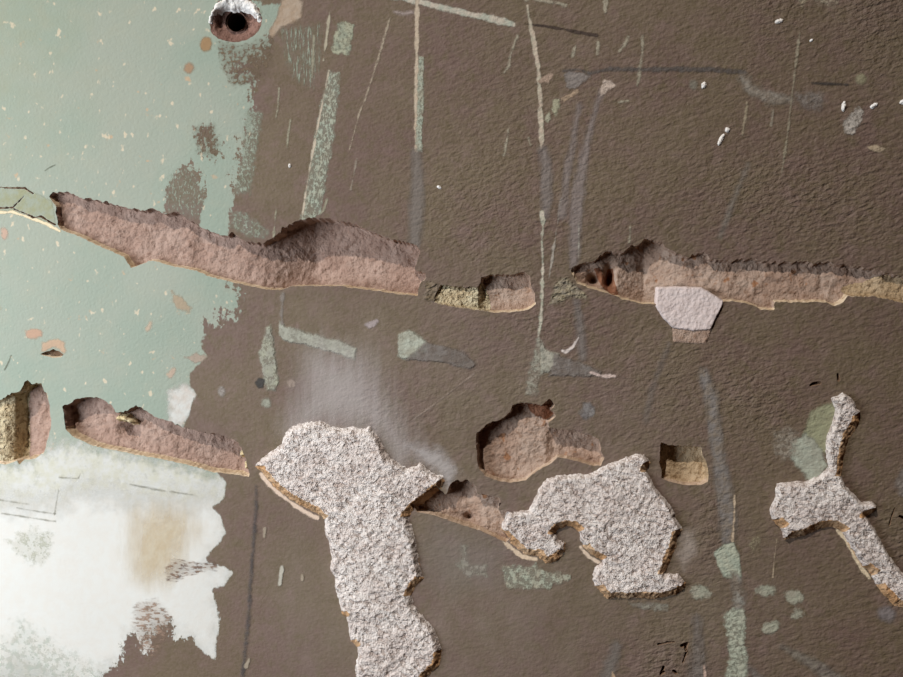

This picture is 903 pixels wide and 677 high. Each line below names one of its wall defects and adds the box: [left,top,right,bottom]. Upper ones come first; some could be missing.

crack [0,187,56,225]
spalling [0,210,536,313]
peeling [549,271,902,344]
spalling [476,399,604,483]
spalling [640,461,708,485]
peeling [0,426,329,677]
spalling [400,479,566,564]
spalling [547,520,584,535]
spalling [579,544,607,564]